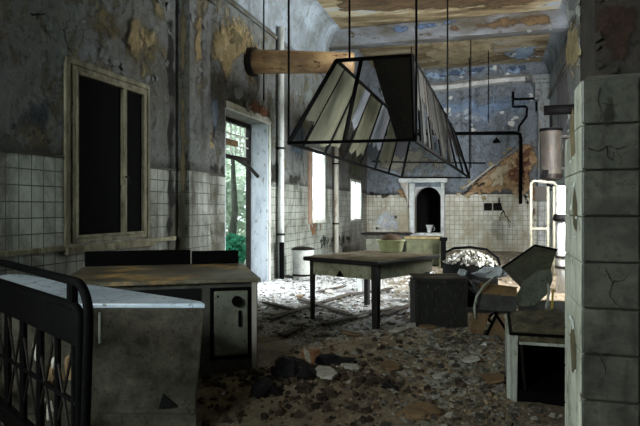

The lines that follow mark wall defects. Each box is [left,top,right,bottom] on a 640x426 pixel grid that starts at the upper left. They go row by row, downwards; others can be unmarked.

peeling [425,47,539,80]